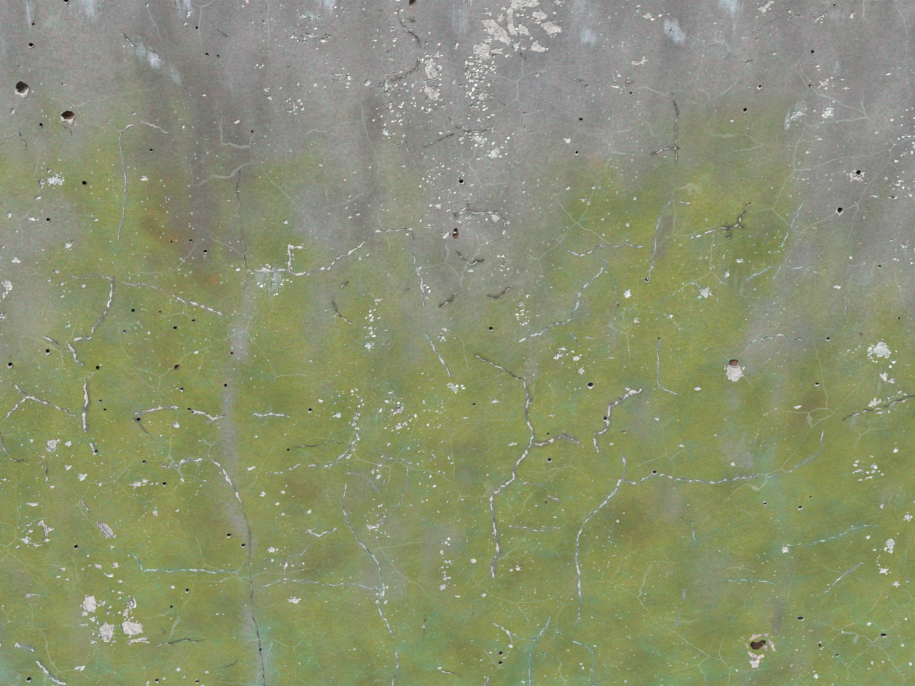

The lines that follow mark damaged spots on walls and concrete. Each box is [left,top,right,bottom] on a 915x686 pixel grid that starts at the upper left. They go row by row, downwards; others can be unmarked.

peeling [256,0,562,239]
peeling [73,537,150,646]
crack [1,275,223,462]
damp [0,0,418,686]
crack [133,406,398,686]
crack [236,169,459,325]
damp [481,243,589,406]
crack [474,342,676,577]
damp [362,349,915,686]
damp [704,163,802,306]
spalling [746,633,776,668]
peeling [867,339,908,414]